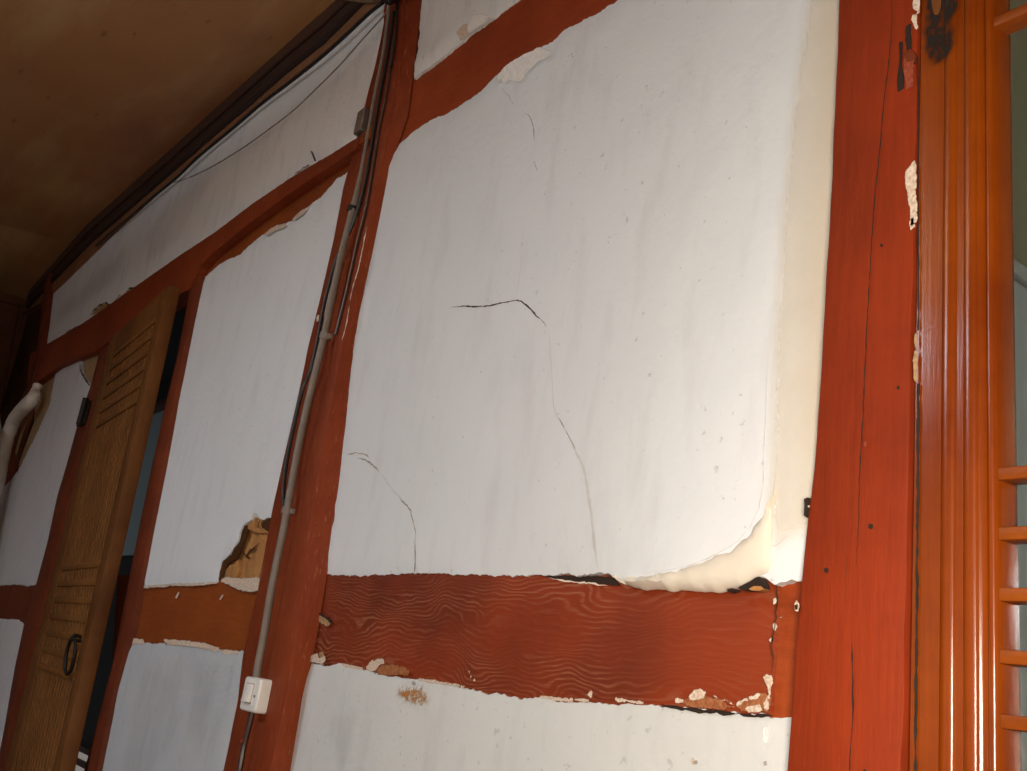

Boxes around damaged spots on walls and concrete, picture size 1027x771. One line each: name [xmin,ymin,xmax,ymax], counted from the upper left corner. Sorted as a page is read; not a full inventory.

spalling [496,47,554,105]
spalling [897,24,919,92]
crack [458,228,598,567]
crack [348,452,416,572]
spalling [144,517,271,592]
spalling [310,651,326,664]
spalling [366,658,409,676]
spalling [661,674,773,744]